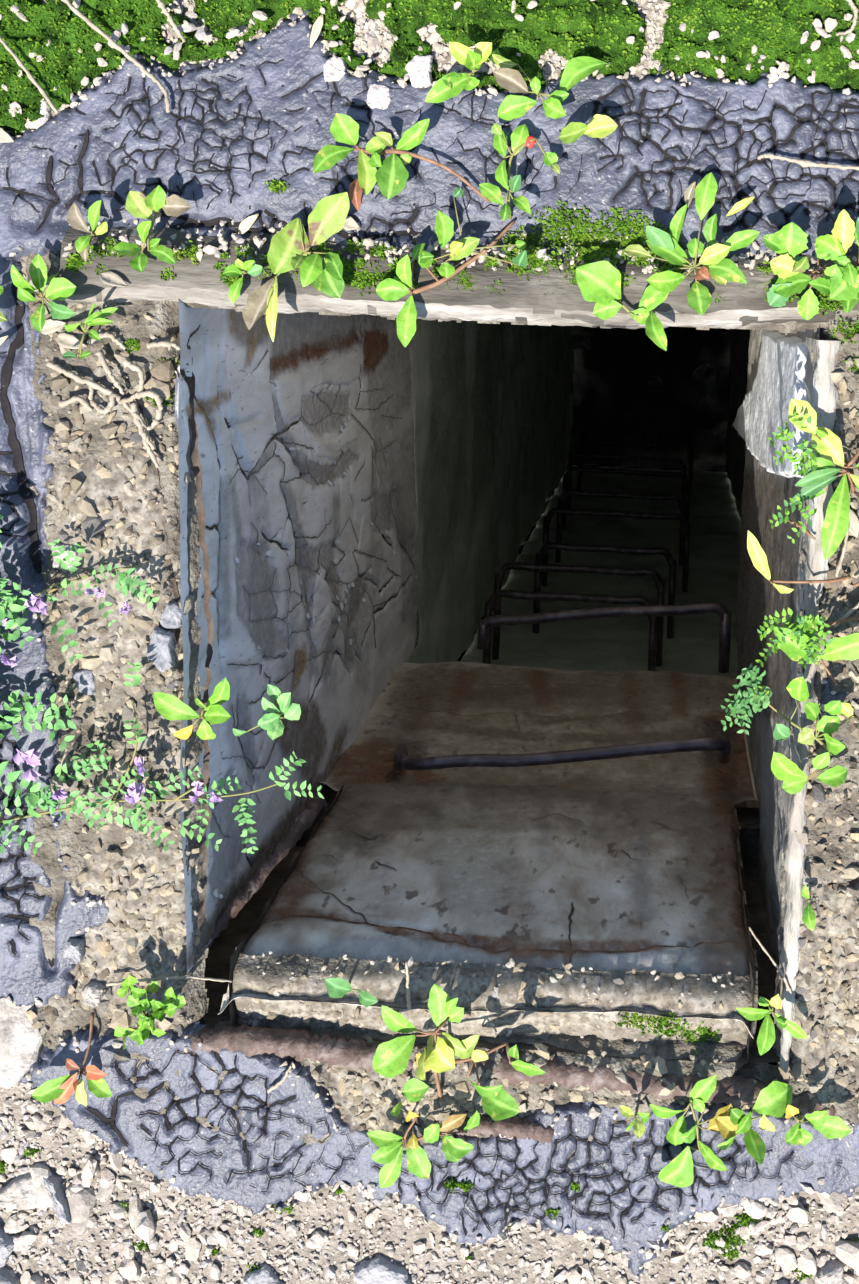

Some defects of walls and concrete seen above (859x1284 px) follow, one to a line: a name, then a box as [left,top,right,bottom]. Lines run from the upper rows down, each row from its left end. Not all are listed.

crack [2,56,859,245]
crack [0,284,42,574]
rust [231,312,270,361]
rust [270,330,388,374]
crack [143,325,415,930]
rust [207,794,328,949]
rust [323,916,663,964]
crack [274,807,730,963]
rust [176,1024,379,1073]
crack [85,1050,842,1239]
rust [462,1050,836,1117]